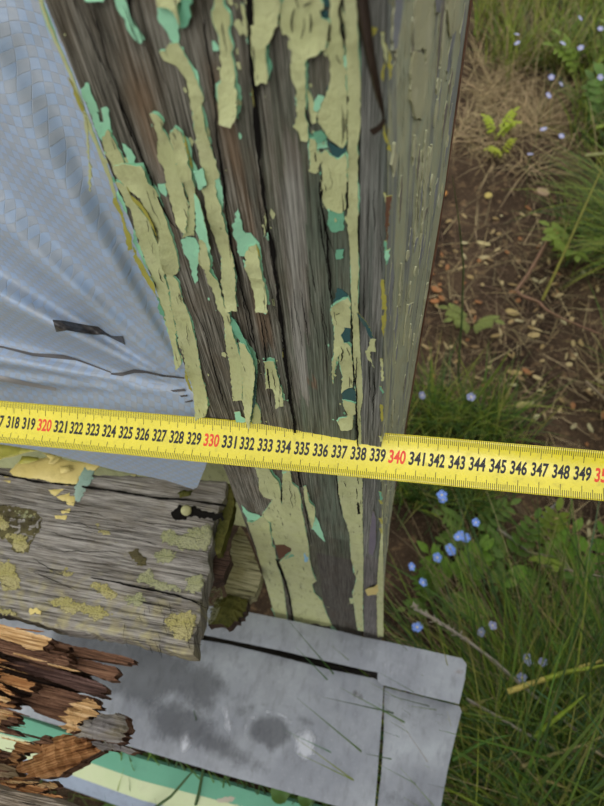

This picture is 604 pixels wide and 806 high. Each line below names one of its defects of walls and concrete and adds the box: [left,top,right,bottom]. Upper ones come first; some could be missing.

peeling [39,0,285,430]
peeling [211,0,404,445]
peeling [398,0,460,349]
peeling [242,467,337,631]
peeling [337,475,395,637]